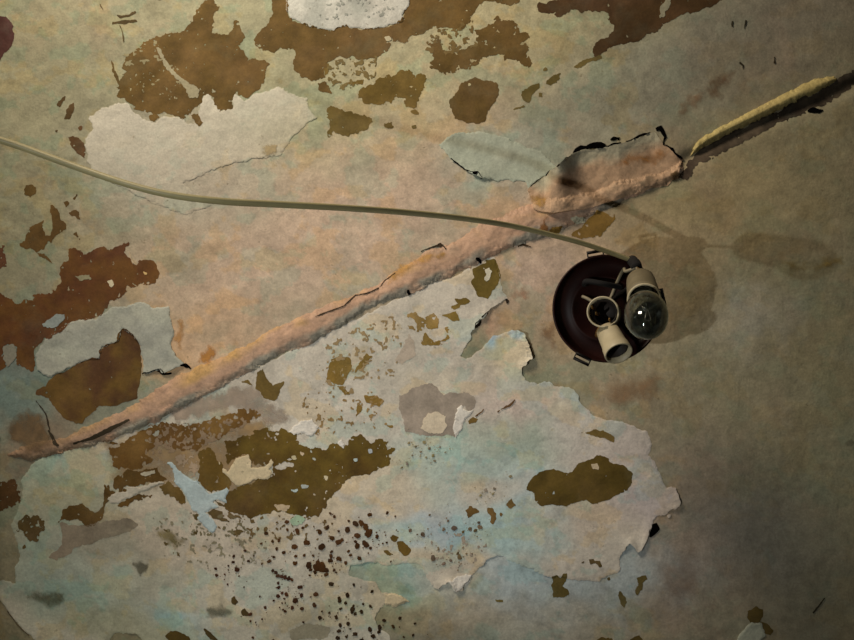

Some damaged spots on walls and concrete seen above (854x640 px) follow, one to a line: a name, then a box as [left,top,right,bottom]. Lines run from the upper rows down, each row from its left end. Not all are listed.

peeling [537,0,720,68]
peeling [57,96,74,119]
peeling [68,0,561,215]
peeling [0,194,184,424]
crack [315,273,395,317]
crack [36,401,130,446]
peeling [0,257,681,640]